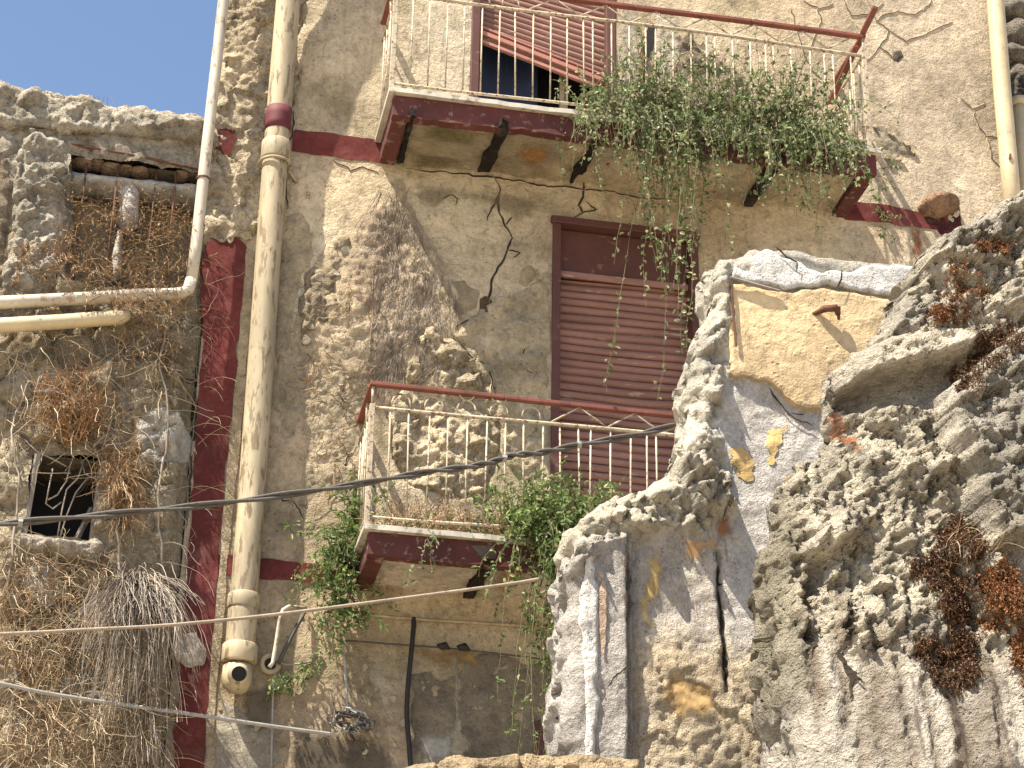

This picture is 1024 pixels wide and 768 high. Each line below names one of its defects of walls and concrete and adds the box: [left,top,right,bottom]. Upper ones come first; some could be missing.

crack [790,0,953,80]
crack [333,159,378,173]
crack [961,98,1000,168]
crack [403,168,688,393]
peeling [728,249,912,411]
crack [768,387,813,426]
rust [829,414,860,451]
crack [716,555,728,687]